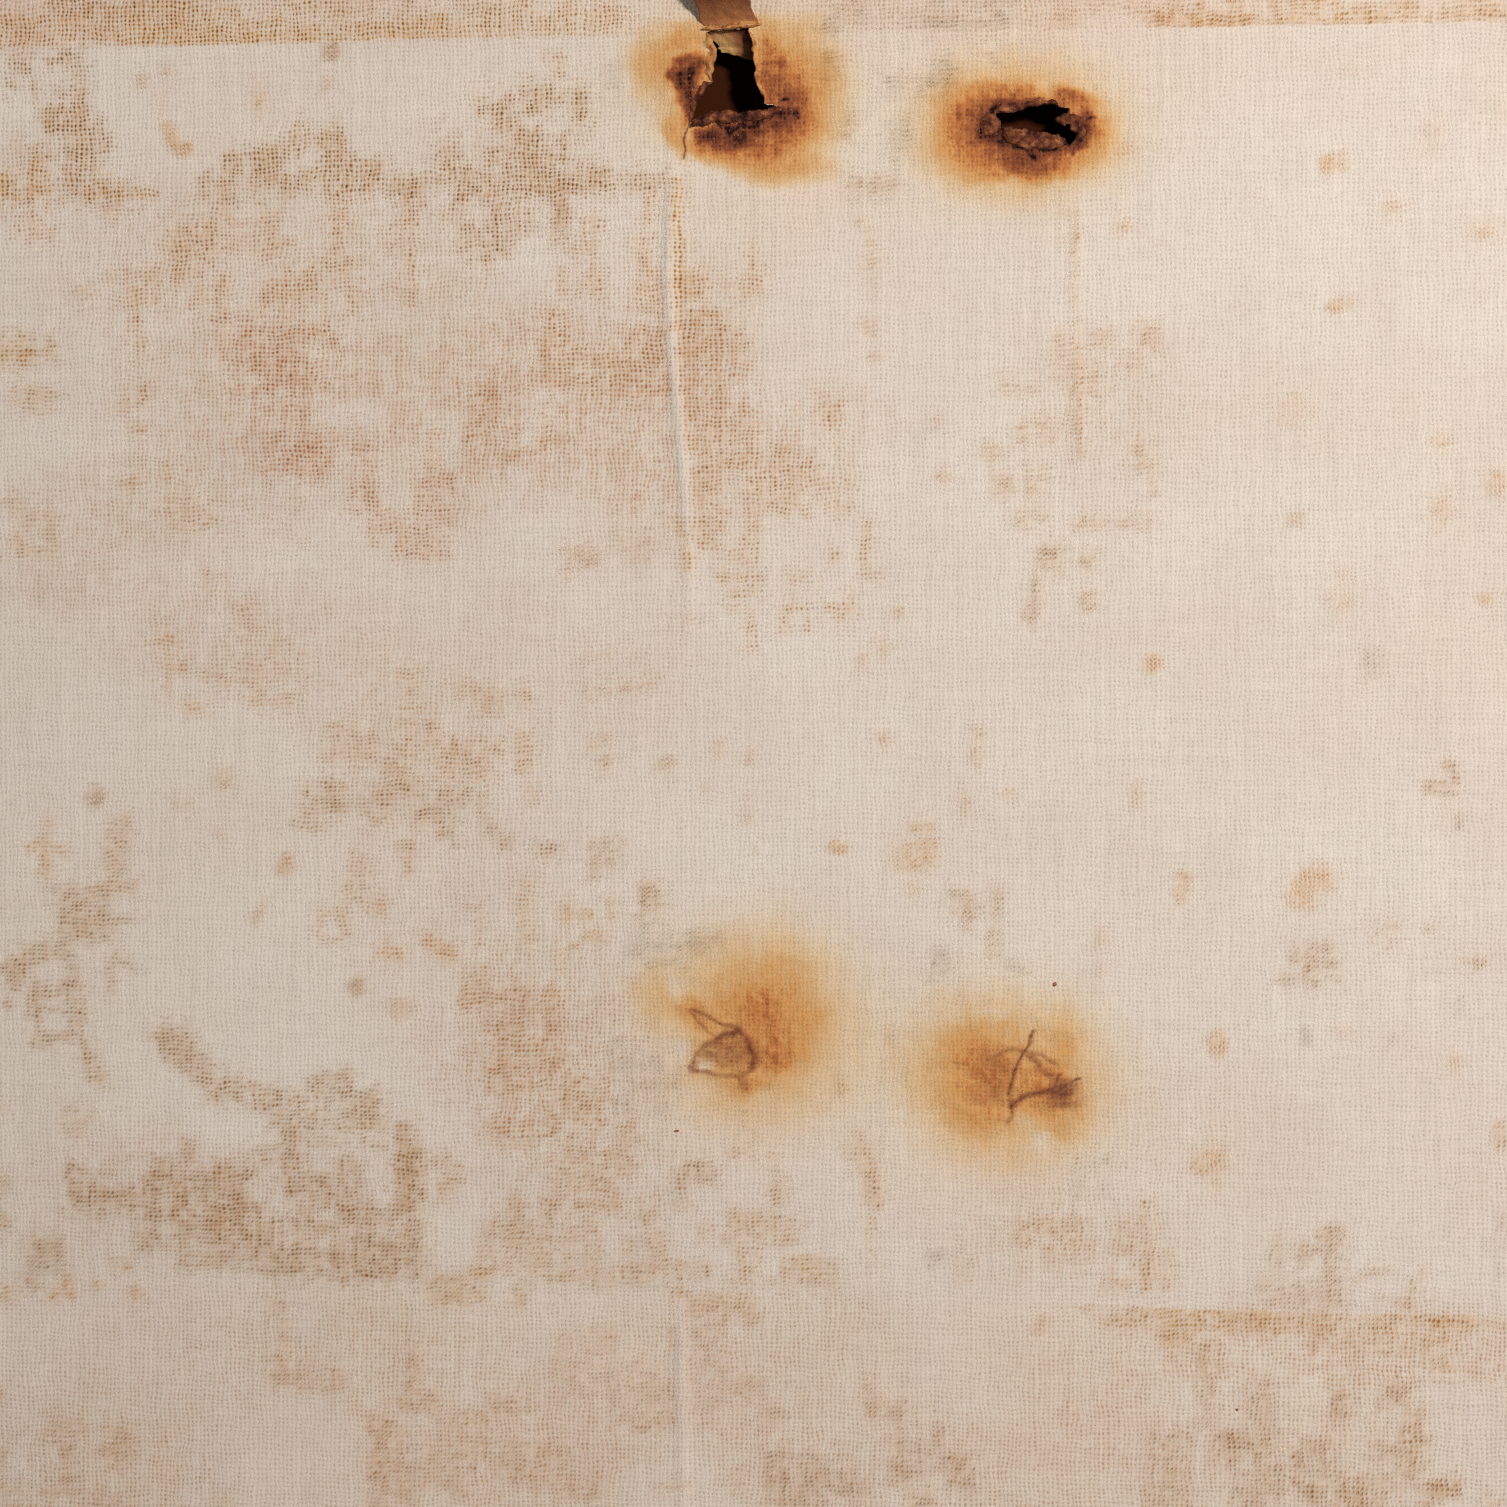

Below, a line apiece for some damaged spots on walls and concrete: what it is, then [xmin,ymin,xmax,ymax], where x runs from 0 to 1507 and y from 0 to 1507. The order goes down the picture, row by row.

peeling [691,110,768,127]
peeling [980,114,1081,149]